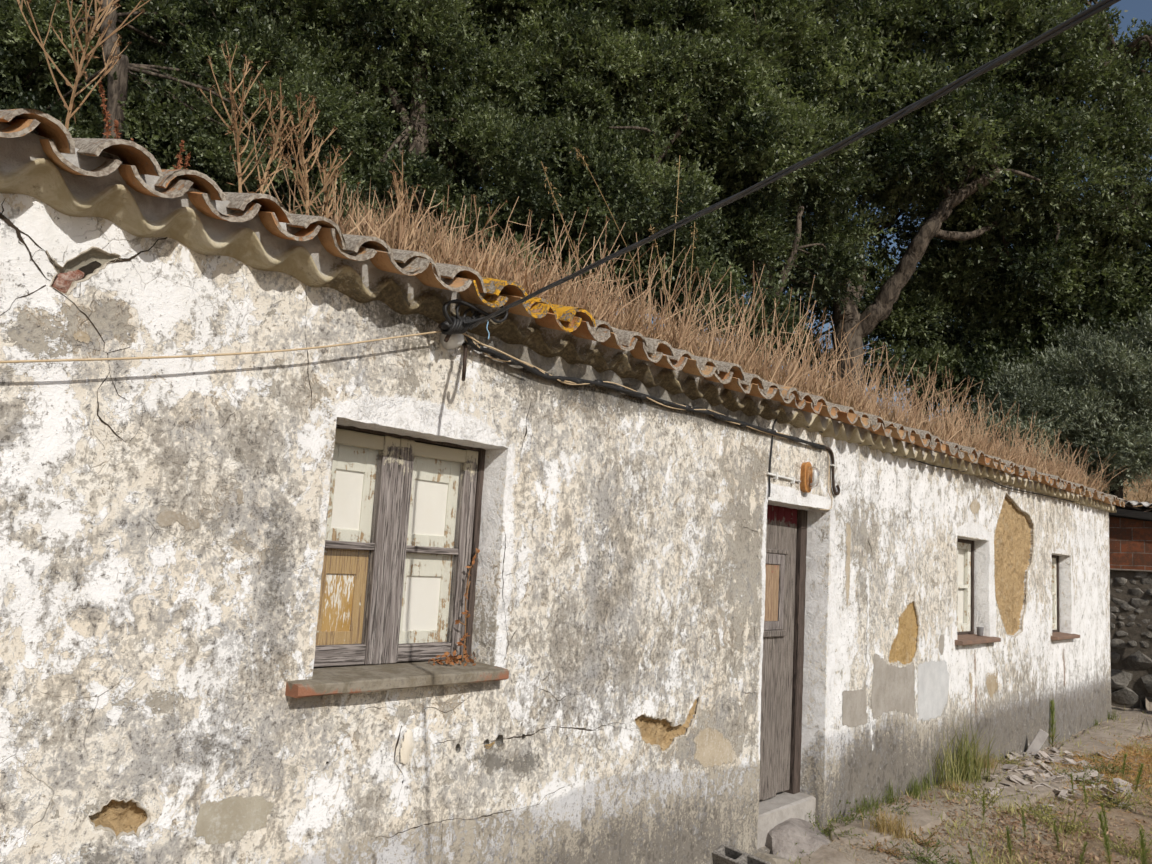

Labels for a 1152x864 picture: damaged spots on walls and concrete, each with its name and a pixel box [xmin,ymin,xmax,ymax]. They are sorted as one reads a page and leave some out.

flaking render [46,246,121,296]
crack [107,237,168,264]
crack [0,197,129,441]
flaking render [994,493,1035,638]
flaking render [888,600,920,667]
crack [329,689,630,843]
water stain [474,746,540,777]
flaking render [634,693,736,768]
flaking render [88,798,151,840]